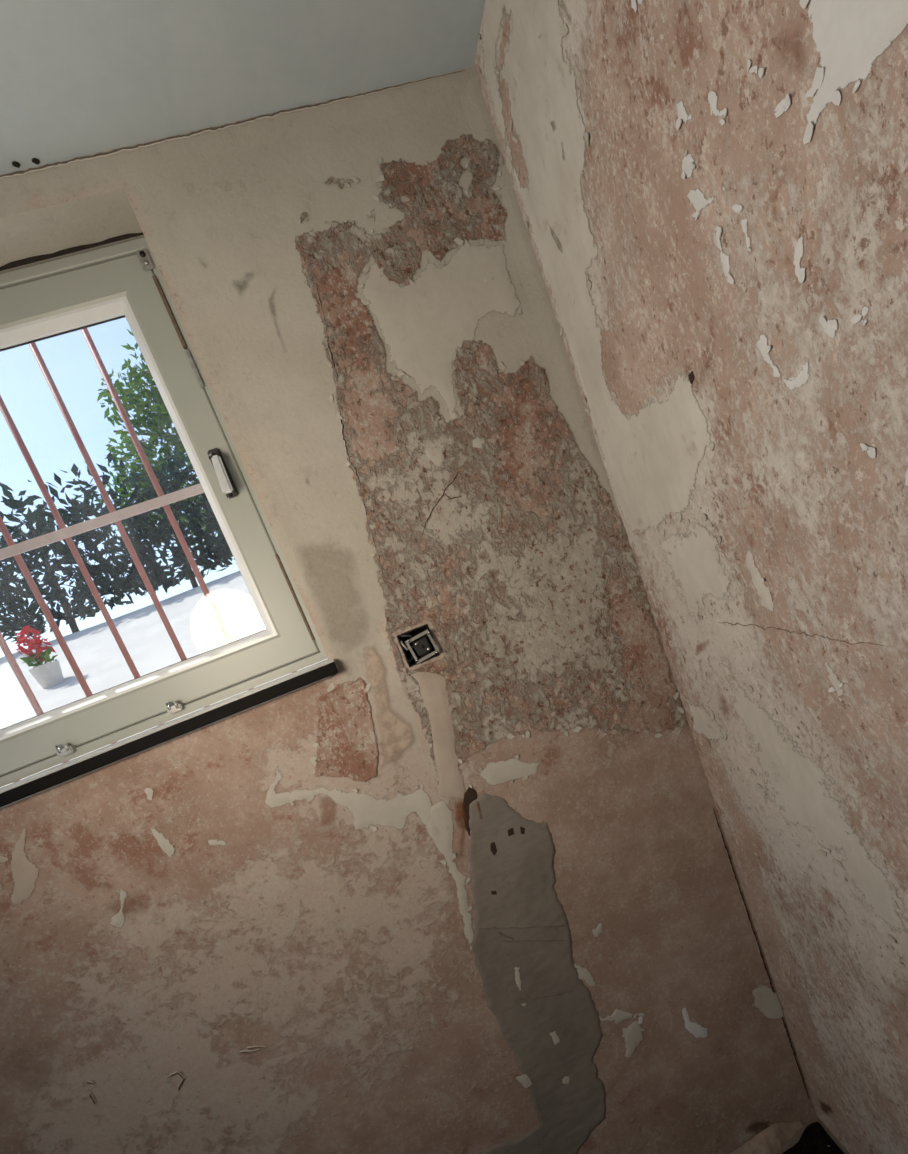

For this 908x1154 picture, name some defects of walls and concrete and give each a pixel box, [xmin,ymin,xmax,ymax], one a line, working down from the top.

peeling [708,90,727,126]
peeling [764,90,791,118]
peeling [805,67,861,106]
peeling [681,151,725,221]
peeling [715,226,734,284]
peeling [732,204,752,252]
peeling [793,237,806,283]
peeling [819,306,869,338]
peeling [756,335,810,390]
flaking render [295,0,715,792]
peeling [745,551,774,612]
spalling [463,784,477,839]